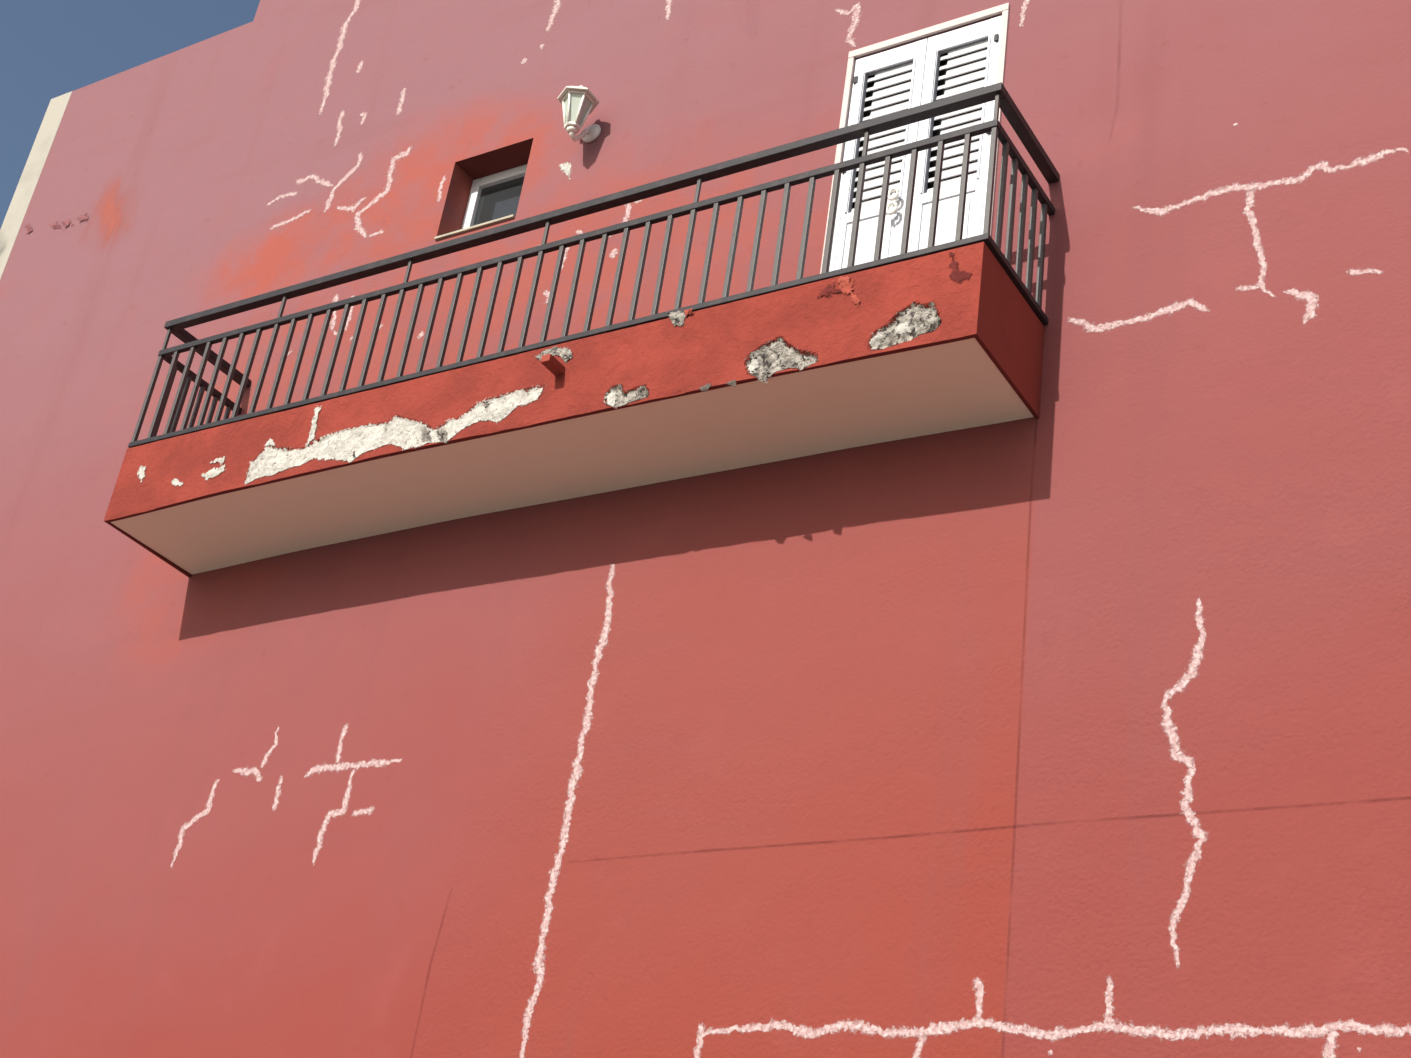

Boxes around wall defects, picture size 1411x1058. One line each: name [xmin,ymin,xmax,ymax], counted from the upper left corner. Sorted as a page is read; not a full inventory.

crack [267,0,412,238]
crack [1133,147,1408,324]
spalling [244,385,543,485]
peeling [535,346,572,363]
spalling [604,384,649,409]
spalling [698,338,818,392]
spalling [869,301,942,350]
crack [1068,299,1208,333]
crack [171,724,402,868]
crack [520,564,615,1058]
crack [1161,599,1207,967]
crack [694,977,1411,1058]